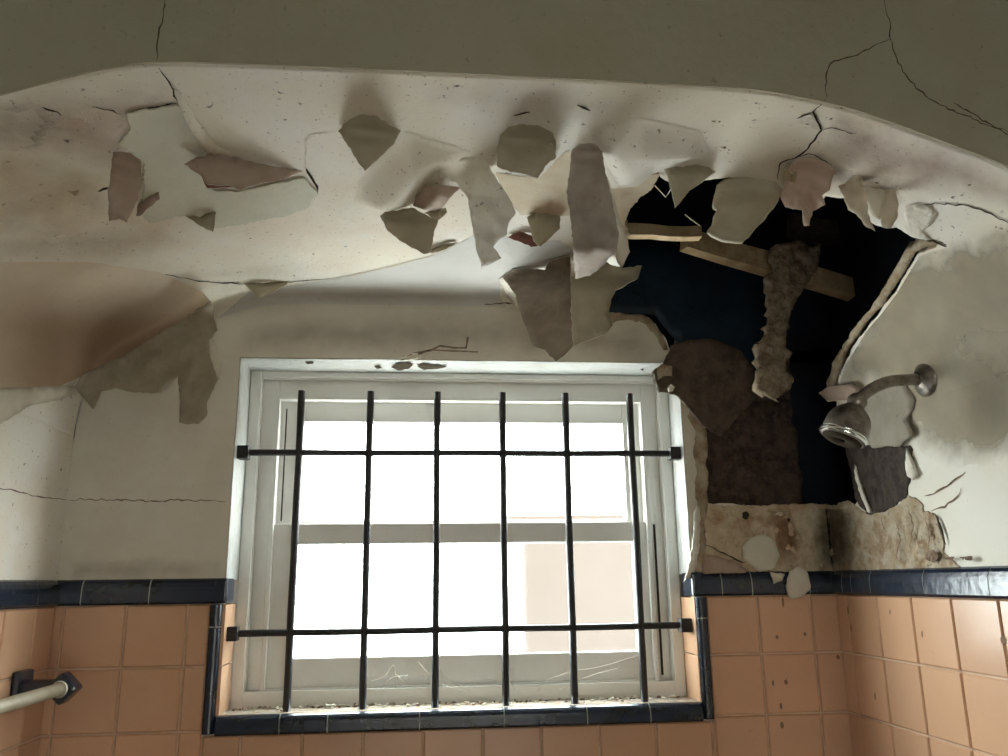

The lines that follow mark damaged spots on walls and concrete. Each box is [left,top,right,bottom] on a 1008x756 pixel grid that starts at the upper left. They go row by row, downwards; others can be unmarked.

crack [96,2,178,115]
crack [777,0,1008,179]
peeling [0,104,973,599]
crack [0,488,222,502]
crack [925,472,965,511]